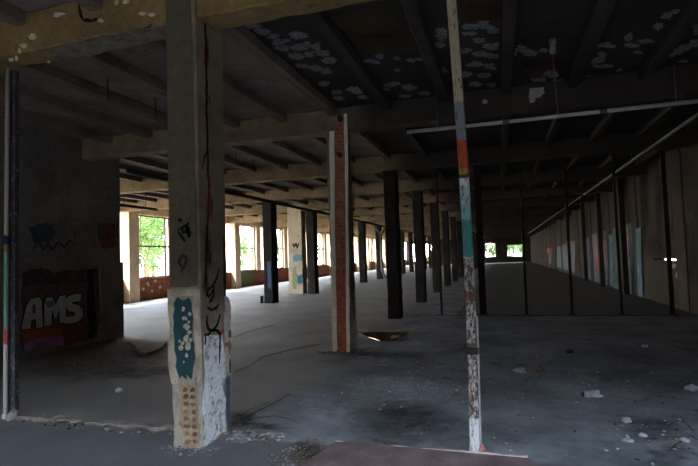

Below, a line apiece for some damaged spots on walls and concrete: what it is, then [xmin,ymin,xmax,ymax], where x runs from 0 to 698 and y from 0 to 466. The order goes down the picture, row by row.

spalling [8,33,37,62]
spalling [47,26,166,63]
peeling [245,23,368,101]
peeling [458,20,500,88]
peeling [585,32,657,77]
spalling [529,70,564,103]
crack [202,22,211,285]